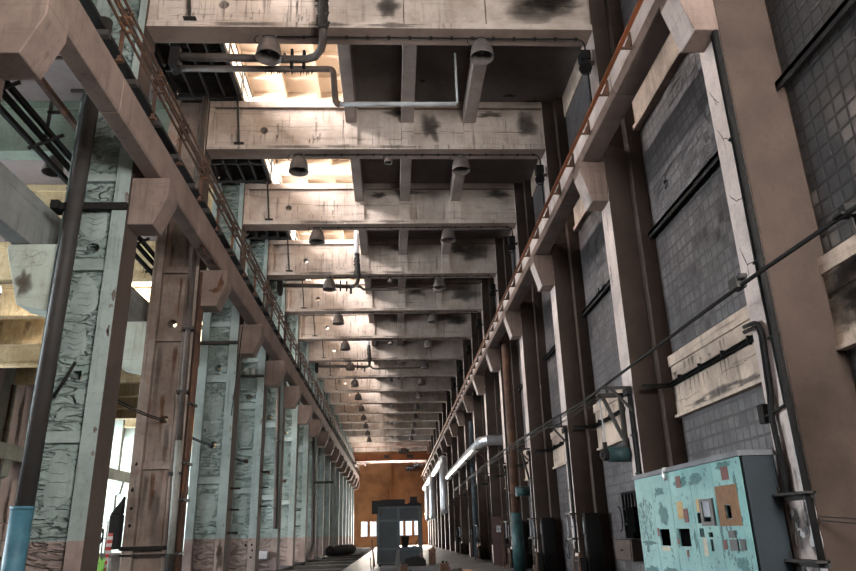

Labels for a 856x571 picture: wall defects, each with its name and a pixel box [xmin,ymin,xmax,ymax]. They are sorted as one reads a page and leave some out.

damp [695,374,760,404]
damp [15,397,25,443]
damp [1,488,11,543]
peeling [789,500,824,553]